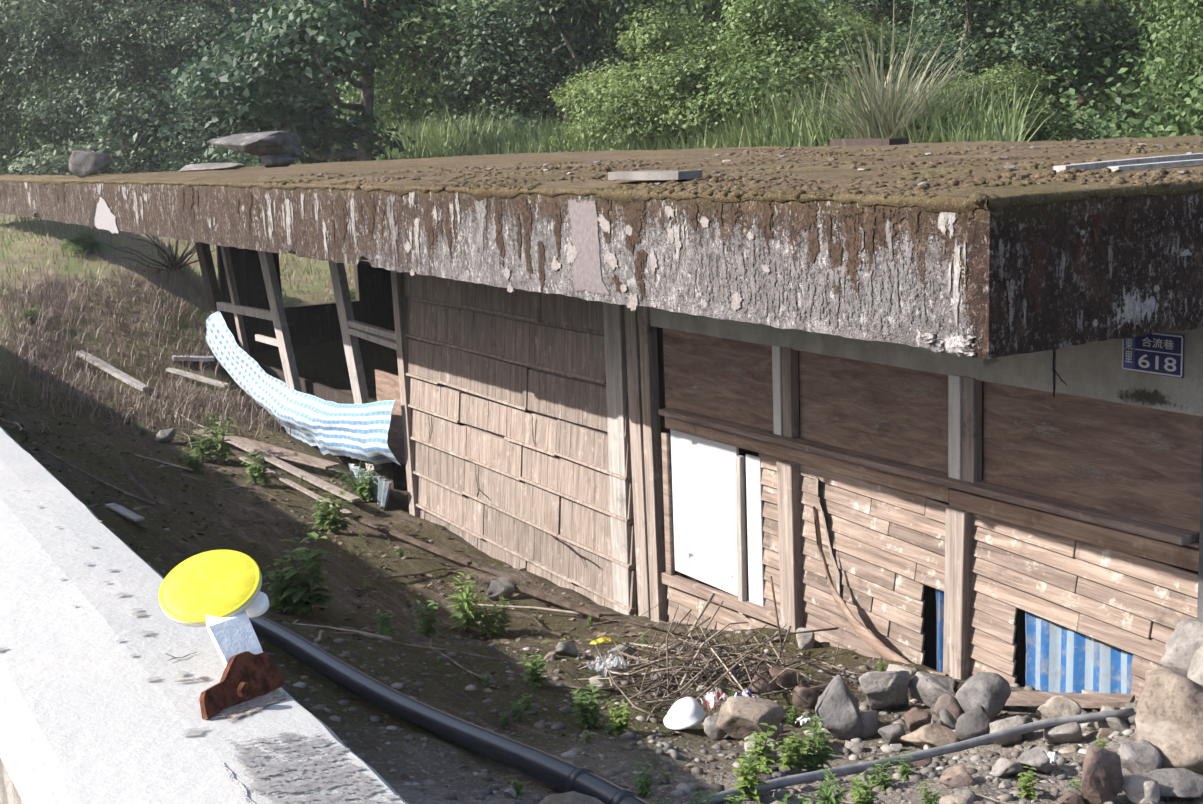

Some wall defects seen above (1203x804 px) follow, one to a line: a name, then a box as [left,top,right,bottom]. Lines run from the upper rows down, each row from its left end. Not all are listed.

spalling [89,197,118,234]
water stain [1118,389,1183,407]